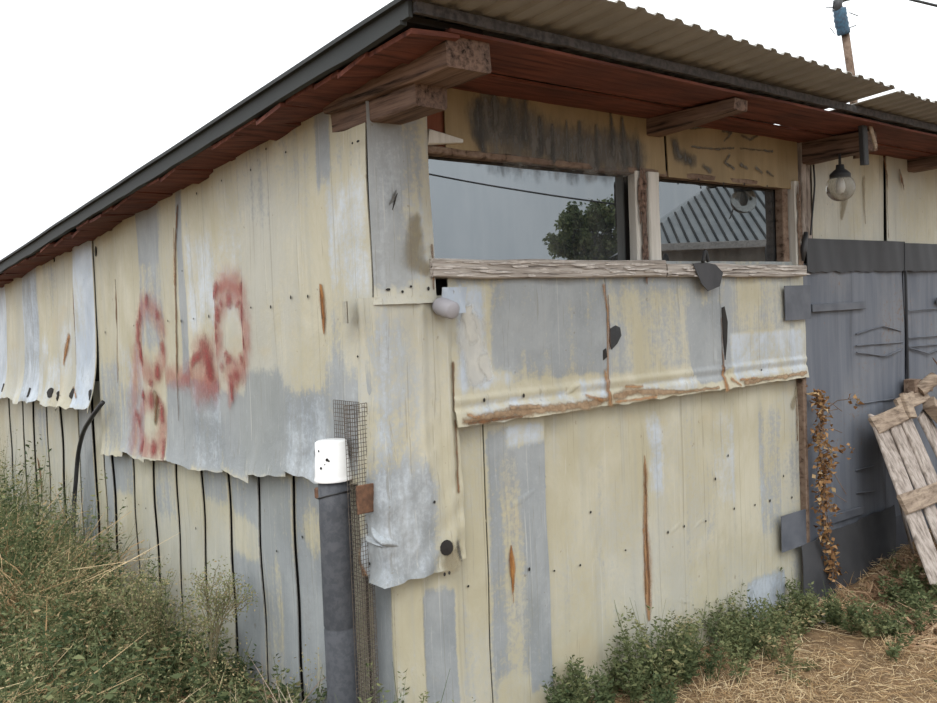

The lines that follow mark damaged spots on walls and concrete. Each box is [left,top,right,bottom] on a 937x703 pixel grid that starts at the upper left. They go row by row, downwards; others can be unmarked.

leakage [470,94,644,177]
corrosion [63,299,76,365]
corrosion [452,284,807,493]
corrosion [643,456,651,621]